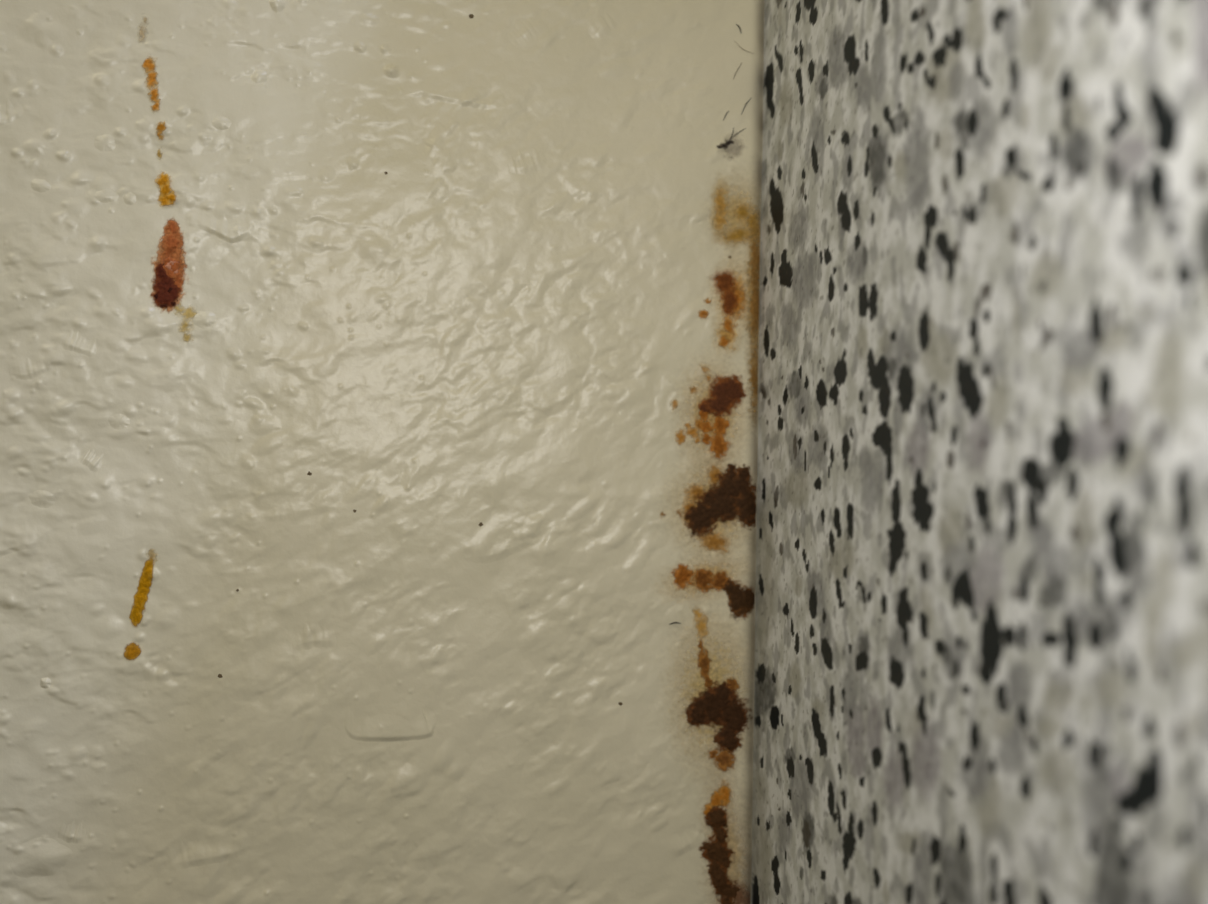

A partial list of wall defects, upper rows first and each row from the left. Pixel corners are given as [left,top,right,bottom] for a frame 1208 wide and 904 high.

rust [142,57,176,206]
rust [151,220,197,341]
rust [661,188,760,618]
rust [129,549,157,626]
rust [124,643,141,660]
rust [683,610,753,771]
rust [700,786,750,904]